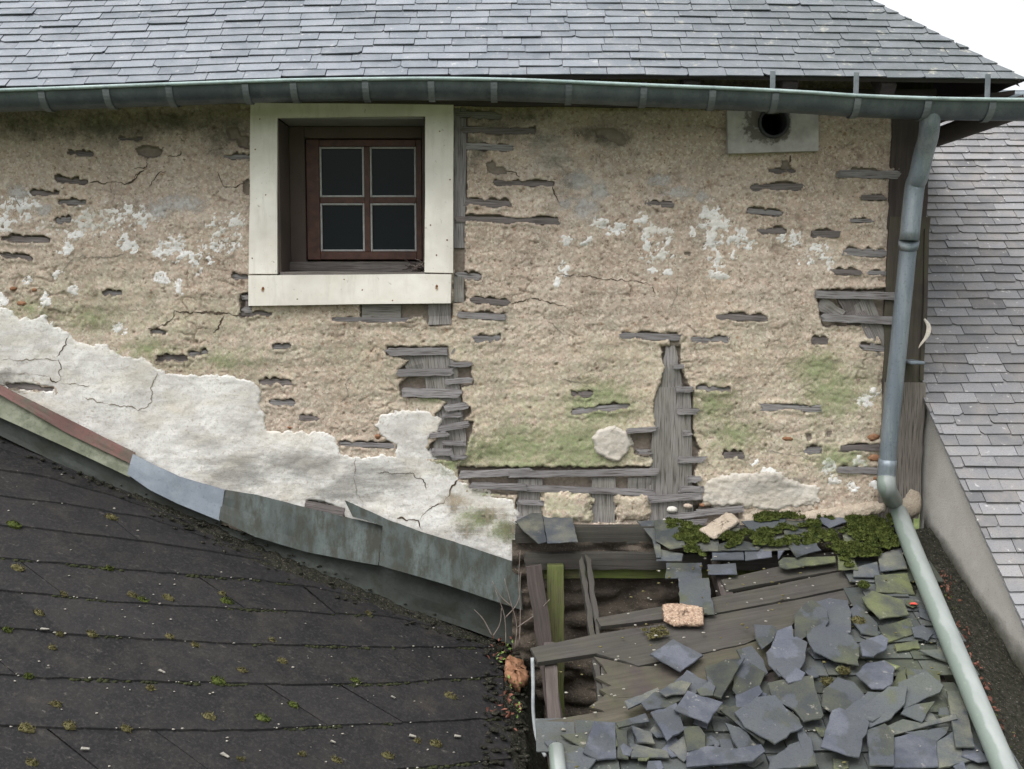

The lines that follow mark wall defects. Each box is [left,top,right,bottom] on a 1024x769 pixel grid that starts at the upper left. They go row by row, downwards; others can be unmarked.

crack [90,152,182,187]
spalling [332,107,691,326]
spalling [689,198,895,357]
crack [148,310,239,333]
crack [0,338,158,412]
flaking render [0,291,882,561]
crack [353,458,458,528]